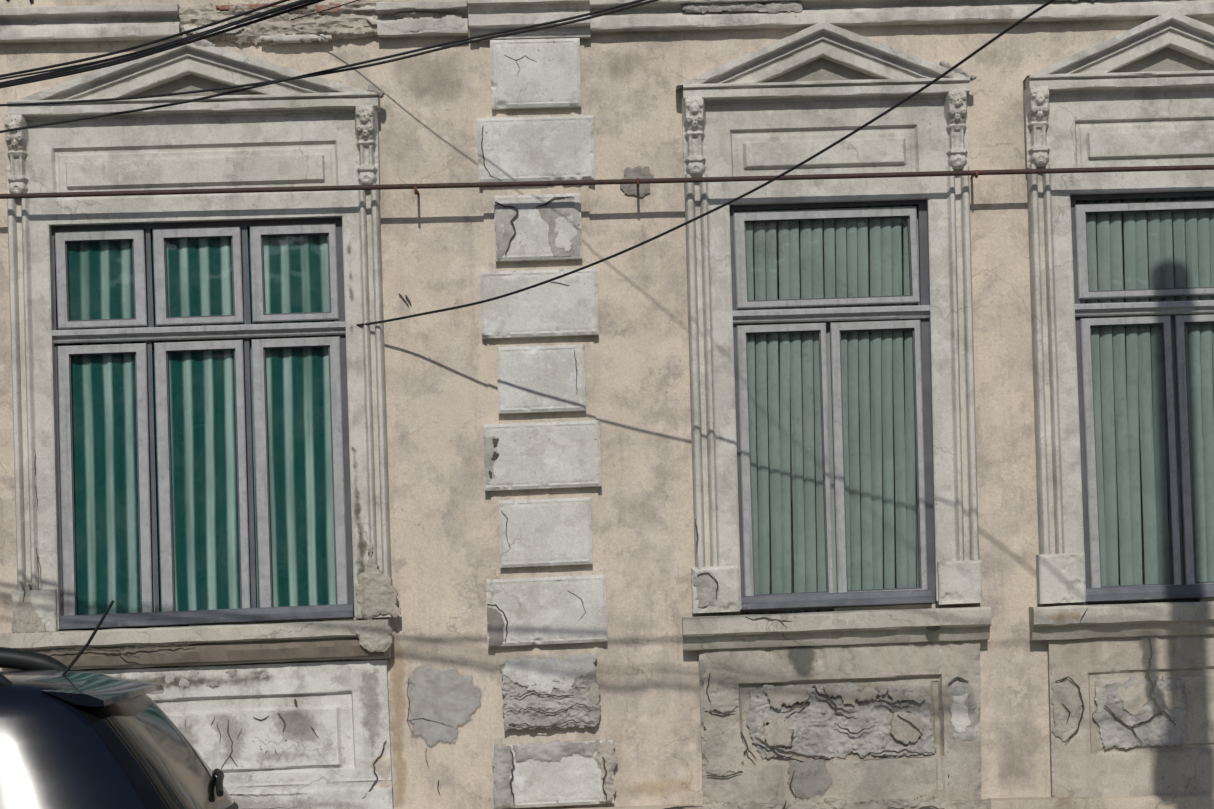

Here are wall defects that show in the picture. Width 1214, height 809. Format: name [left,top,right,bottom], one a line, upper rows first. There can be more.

spalling [178,0,465,47]
spalling [348,492,401,652]
spalling [492,653,618,809]
spalling [664,667,989,809]
spalling [1051,676,1188,749]